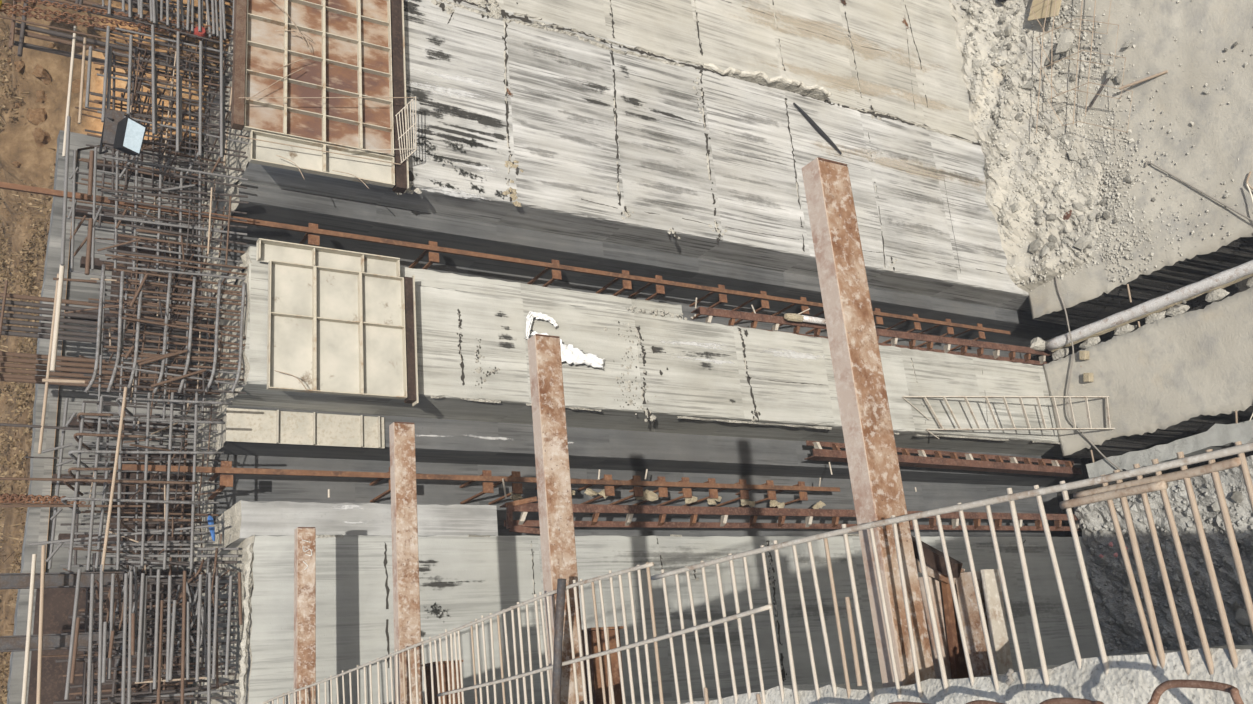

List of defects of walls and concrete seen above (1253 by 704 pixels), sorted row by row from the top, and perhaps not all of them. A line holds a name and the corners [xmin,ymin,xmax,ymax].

spalling [703,63,832,97]
crack [439,0,981,268]
crack [738,328,828,421]